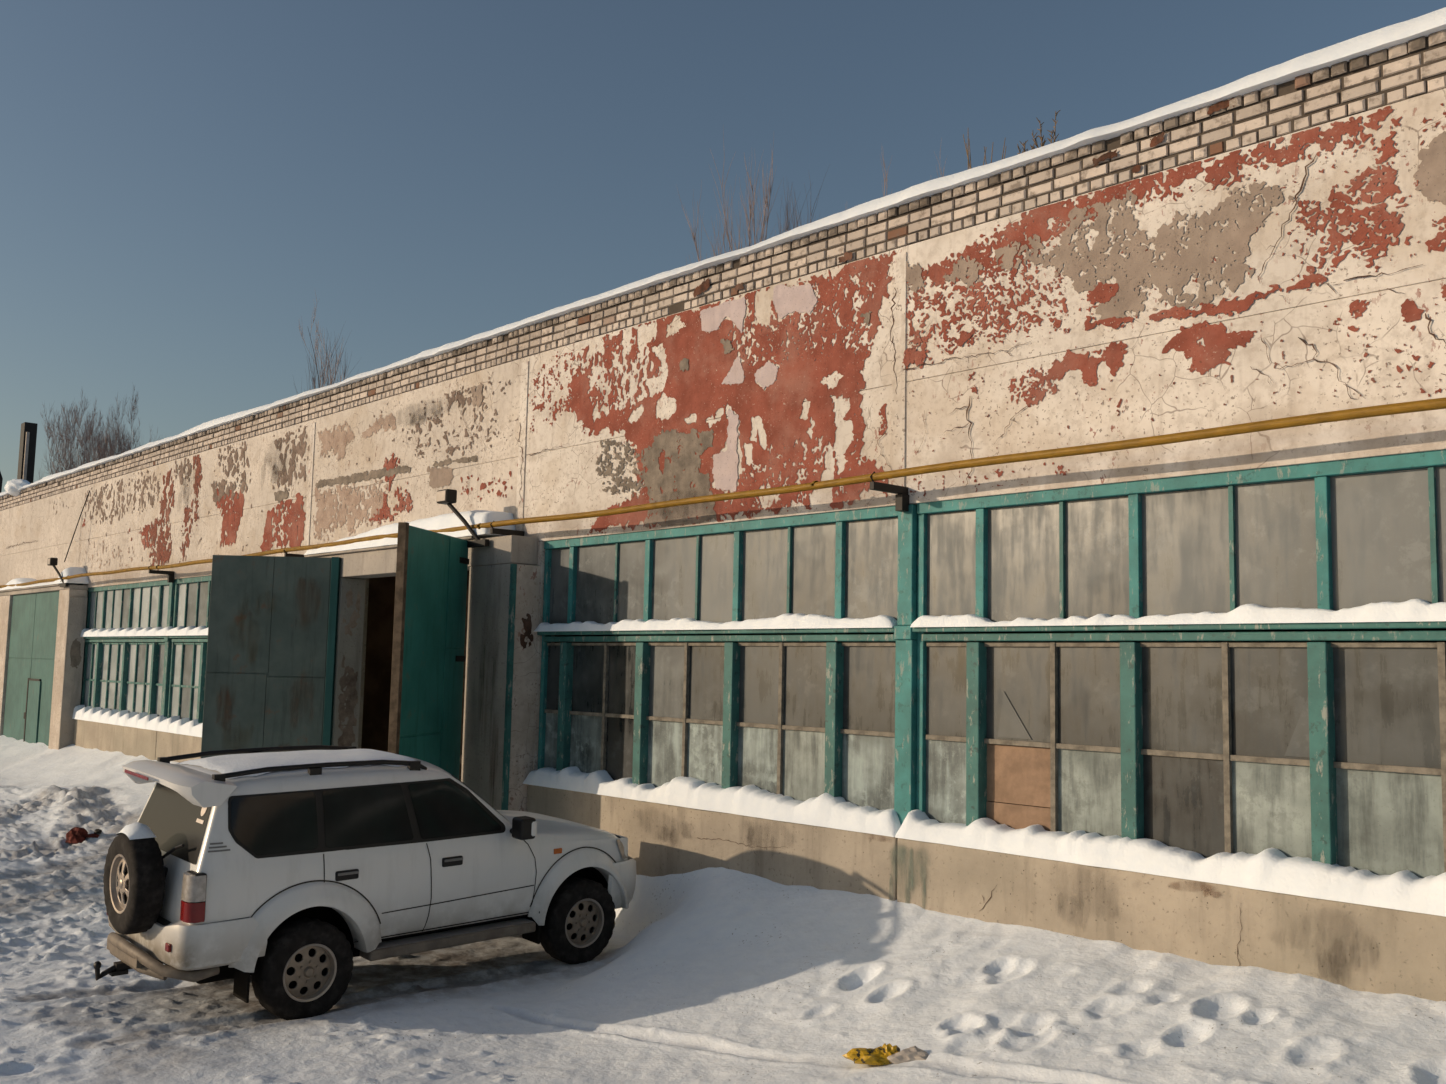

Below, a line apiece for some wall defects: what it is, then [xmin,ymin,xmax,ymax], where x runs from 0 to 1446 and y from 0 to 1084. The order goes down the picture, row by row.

spalling [1207,97,1234,115]
crack [1258,155,1316,304]
peeling [53,103,1446,570]
crack [877,288,1029,485]
crack [1250,337,1363,399]
crack [1323,264,1446,375]